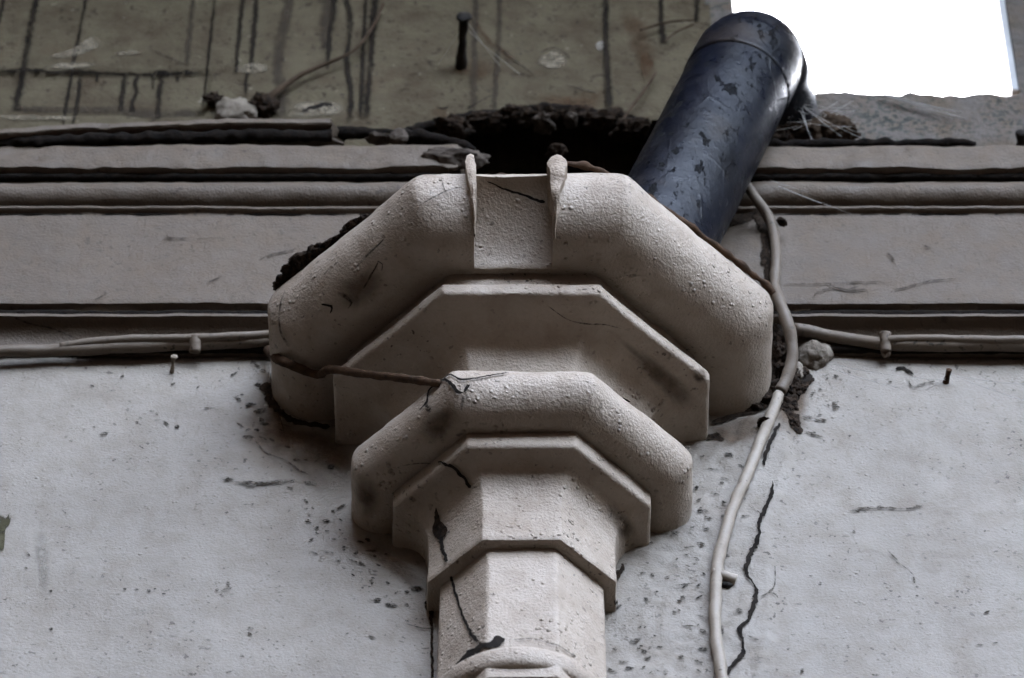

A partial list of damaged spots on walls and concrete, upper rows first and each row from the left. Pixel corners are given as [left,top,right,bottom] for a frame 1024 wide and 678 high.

crack [487,181,545,203]
spalling [779,373,825,437]
crack [408,461,477,488]
crack [727,423,780,675]
crack [432,509,575,664]